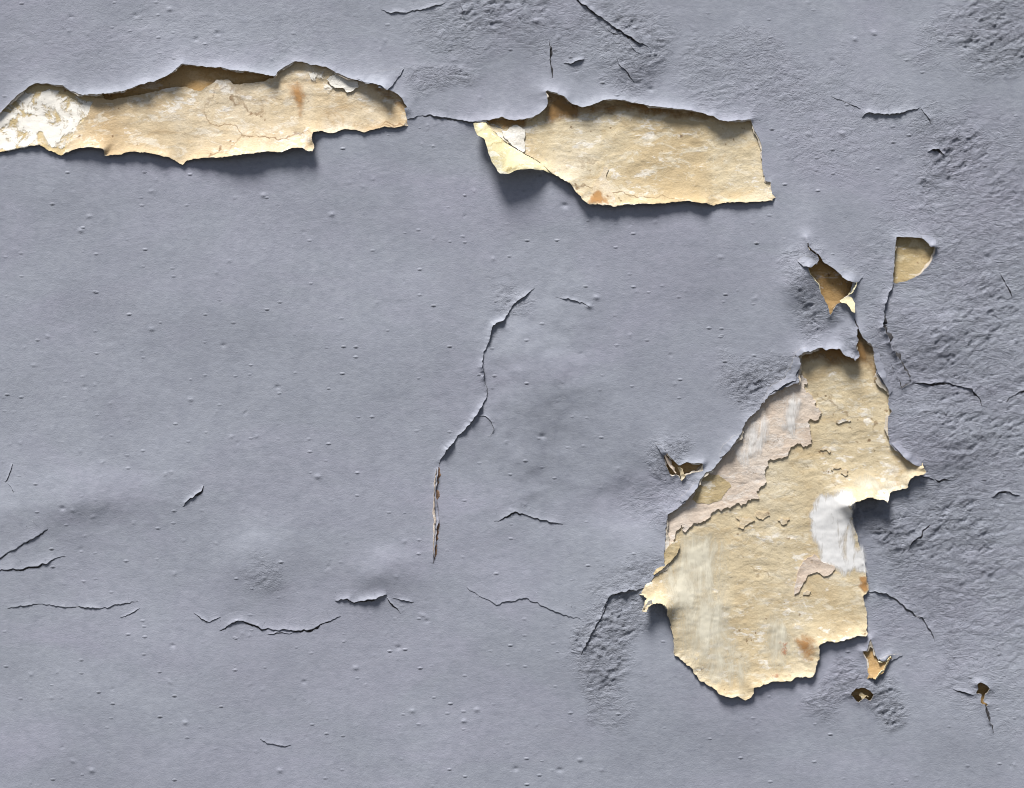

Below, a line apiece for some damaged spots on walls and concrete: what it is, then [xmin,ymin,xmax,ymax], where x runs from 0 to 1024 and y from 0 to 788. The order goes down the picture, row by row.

crack [577,0,652,83]
peeling [0,48,419,165]
peeling [471,76,784,207]
crack [831,87,947,155]
peeling [879,223,946,294]
crack [850,281,1024,407]
crack [427,283,594,563]
peeling [633,230,937,715]
crack [0,515,140,618]
crack [193,585,414,635]
crack [467,575,646,655]
peeling [962,671,1001,718]